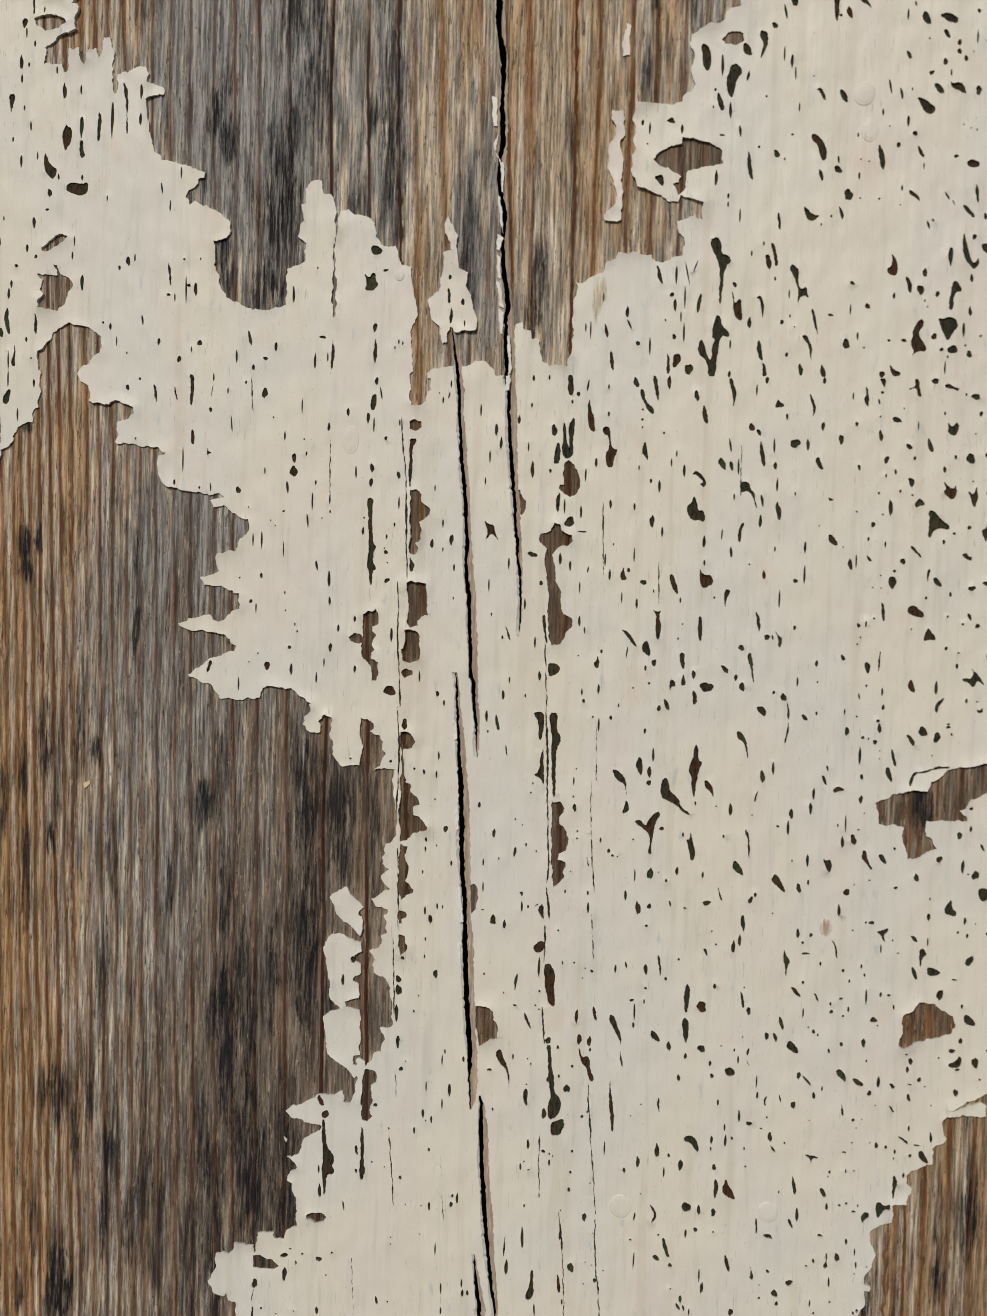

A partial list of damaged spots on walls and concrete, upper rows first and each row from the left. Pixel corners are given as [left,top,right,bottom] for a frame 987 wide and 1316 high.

peeling [35,0,768,555]
crack [452,0,550,1316]
peeling [539,400,617,645]
crack [564,470,660,598]
peeling [622,610,661,656]
peeling [700,569,730,606]
peeling [0,265,428,1316]
crack [590,719,600,887]
peeling [875,764,987,859]
crack [533,1137,564,1315]
crack [588,1085,605,1316]
peeling [858,1094,987,1316]